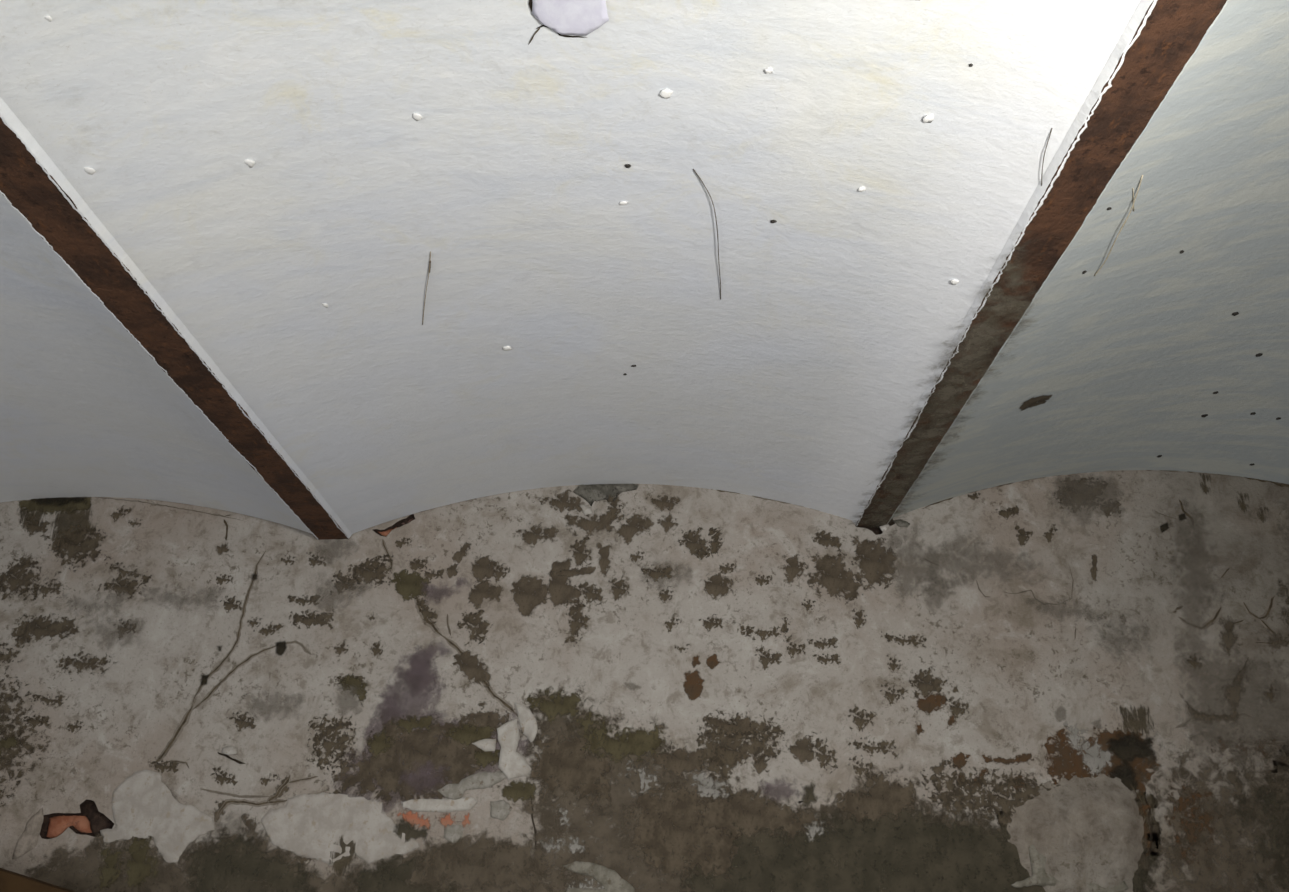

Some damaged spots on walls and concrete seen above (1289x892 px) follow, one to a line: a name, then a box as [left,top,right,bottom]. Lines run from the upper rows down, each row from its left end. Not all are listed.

peeling [532,0,609,36]
leakage [0,497,153,807]
crack [153,551,318,822]
leakage [216,490,841,807]
leakage [755,530,898,629]
leakage [880,633,927,705]
leakage [996,505,1058,546]
leakage [1054,475,1121,518]
flaking render [12,770,215,864]
flaking render [261,703,538,866]
leakage [26,686,1046,892]
leakage [1042,667,1289,892]